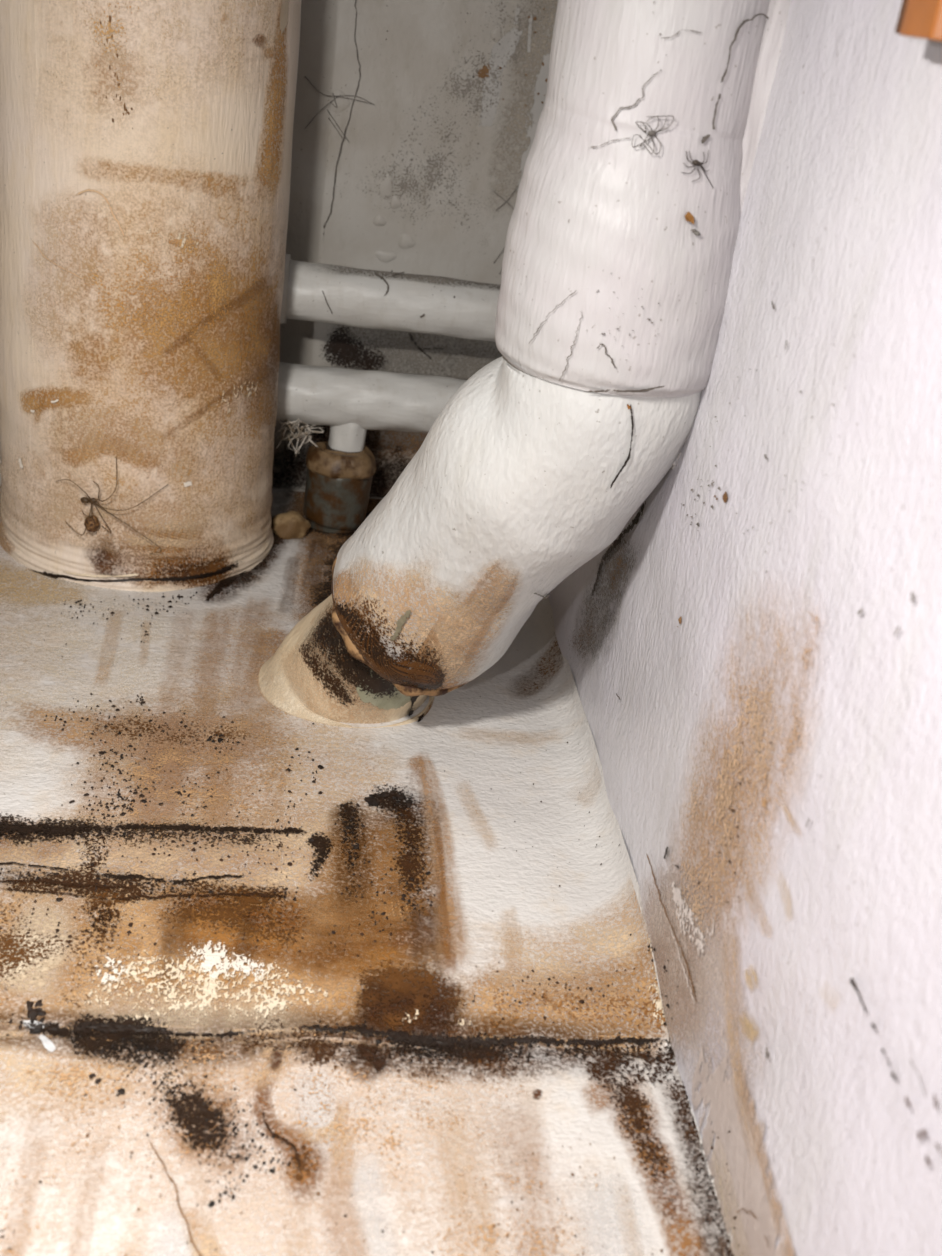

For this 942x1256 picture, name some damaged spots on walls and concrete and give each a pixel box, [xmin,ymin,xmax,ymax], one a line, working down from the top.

rust [88,1,149,129]
rust [221,0,286,191]
crack [323,0,361,237]
damp [477,64,491,82]
rust [0,189,280,589]
rust [0,491,825,1256]